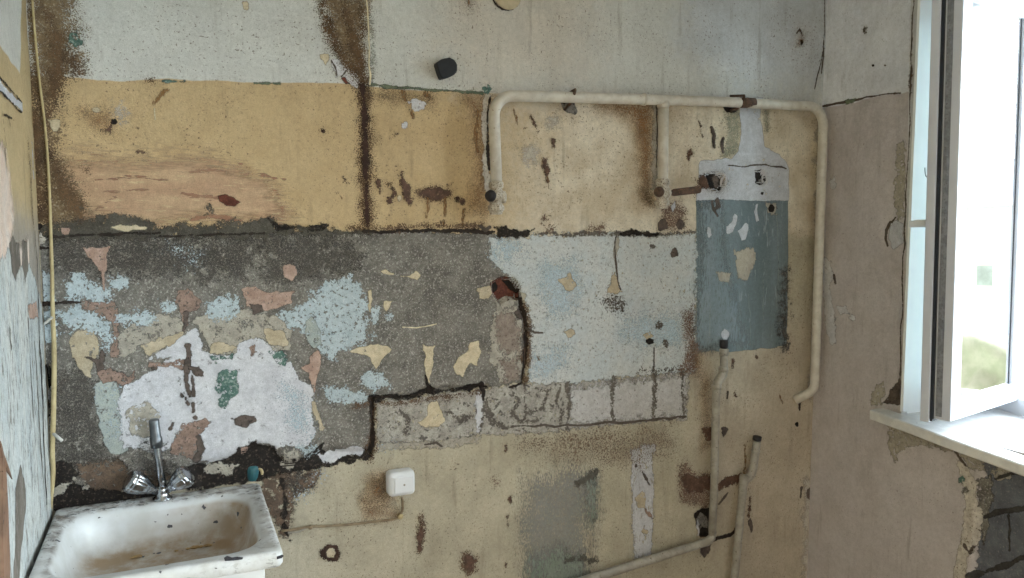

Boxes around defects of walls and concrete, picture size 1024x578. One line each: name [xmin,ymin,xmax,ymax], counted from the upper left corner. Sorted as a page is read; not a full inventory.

water stain [27,0,382,245]
water stain [595,104,653,205]
peeling [699,121,725,153]
peeling [716,204,759,283]
crack [796,0,914,377]
peeling [0,120,712,578]
crack [350,297,543,464]
flaking render [870,373,901,406]
flaking render [953,451,1024,578]